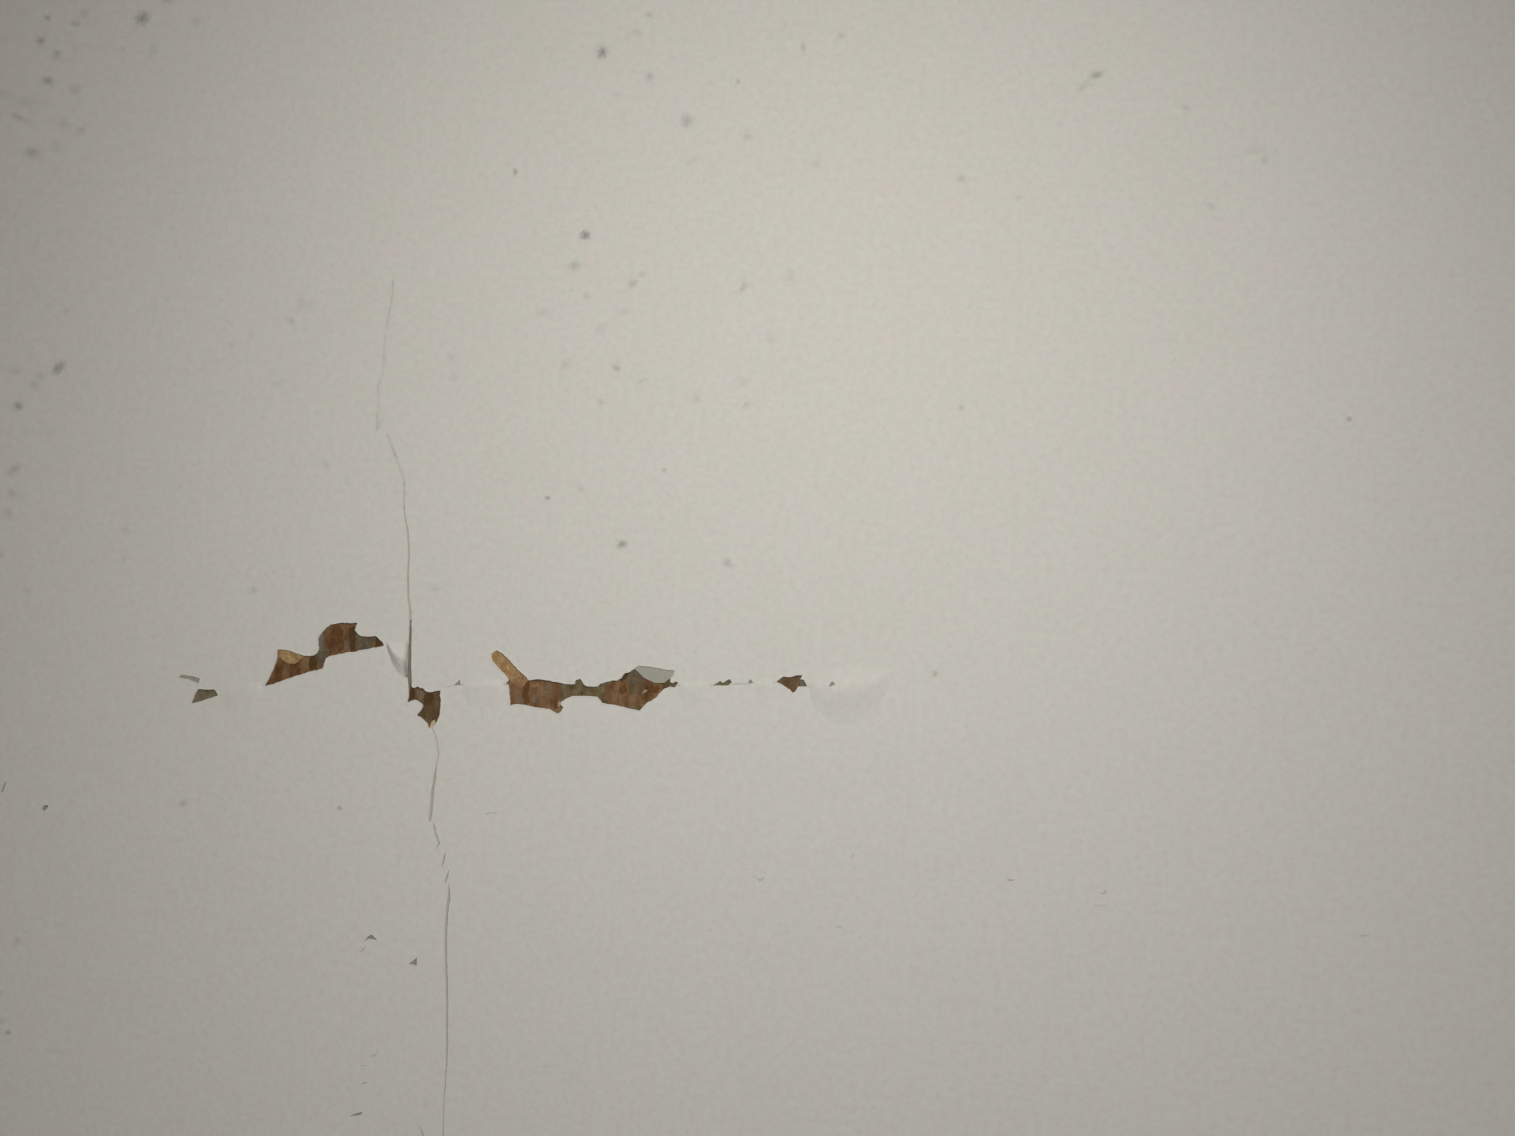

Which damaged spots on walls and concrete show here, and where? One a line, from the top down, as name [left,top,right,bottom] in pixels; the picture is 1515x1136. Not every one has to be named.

crack [404,506,412,693]
peeling [177,674,219,705]
peeling [712,678,754,687]
peeling [775,674,808,694]
crack [429,728,450,1136]